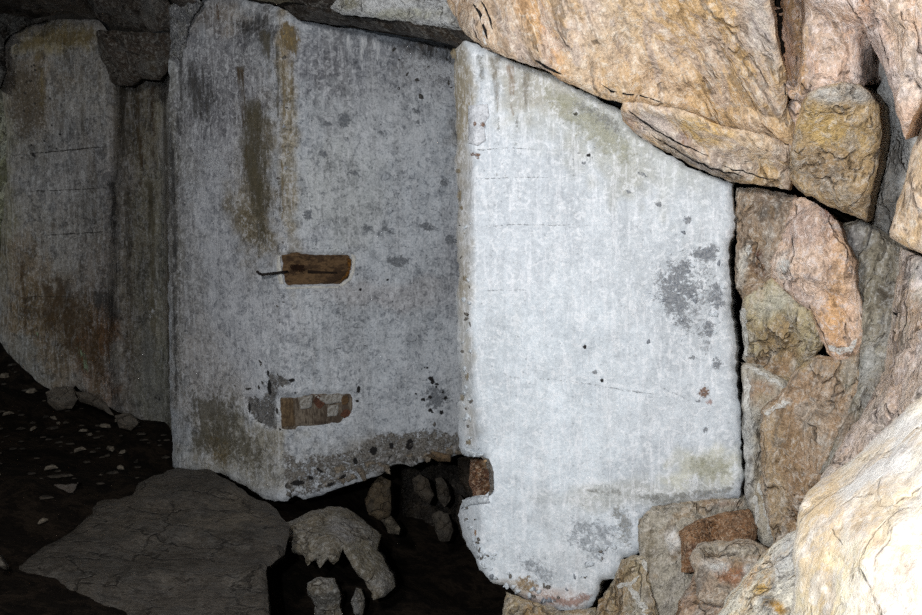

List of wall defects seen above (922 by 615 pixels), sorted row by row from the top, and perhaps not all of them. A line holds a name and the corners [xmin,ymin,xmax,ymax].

water stain [237,67,270,239]
peeling [323,113,351,128]
peeling [387,255,409,267]
spalling [460,276,471,353]
spalling [283,366,568,604]
spalling [566,514,619,579]